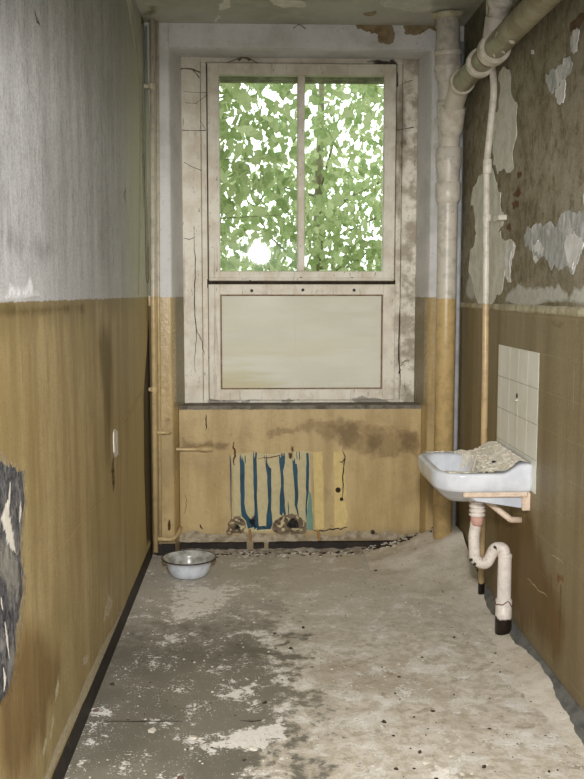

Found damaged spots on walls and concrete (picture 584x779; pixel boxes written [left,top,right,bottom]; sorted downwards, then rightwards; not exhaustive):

peeling [356,11,436,44]
spalling [545,13,584,105]
peeling [468,66,518,304]
peeling [524,193,584,275]
crack [185,237,205,366]
spalling [0,454,27,704]